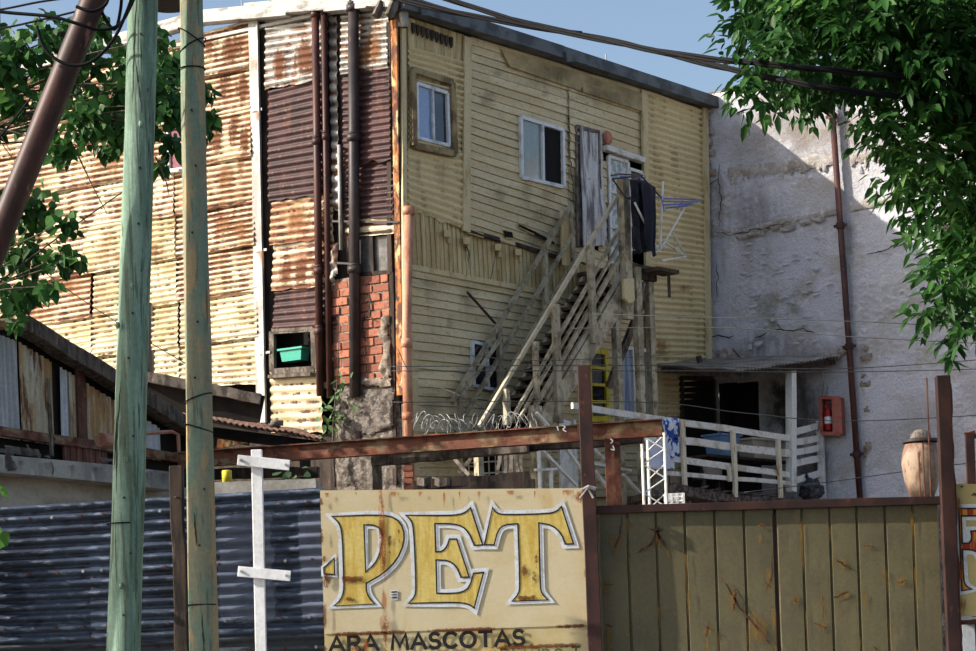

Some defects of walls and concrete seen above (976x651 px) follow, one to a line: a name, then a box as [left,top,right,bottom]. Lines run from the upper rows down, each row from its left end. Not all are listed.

rust [204,33,244,62]
rust [272,38,312,80]
rust [359,32,381,65]
rust [208,59,256,187]
rust [279,240,325,285]